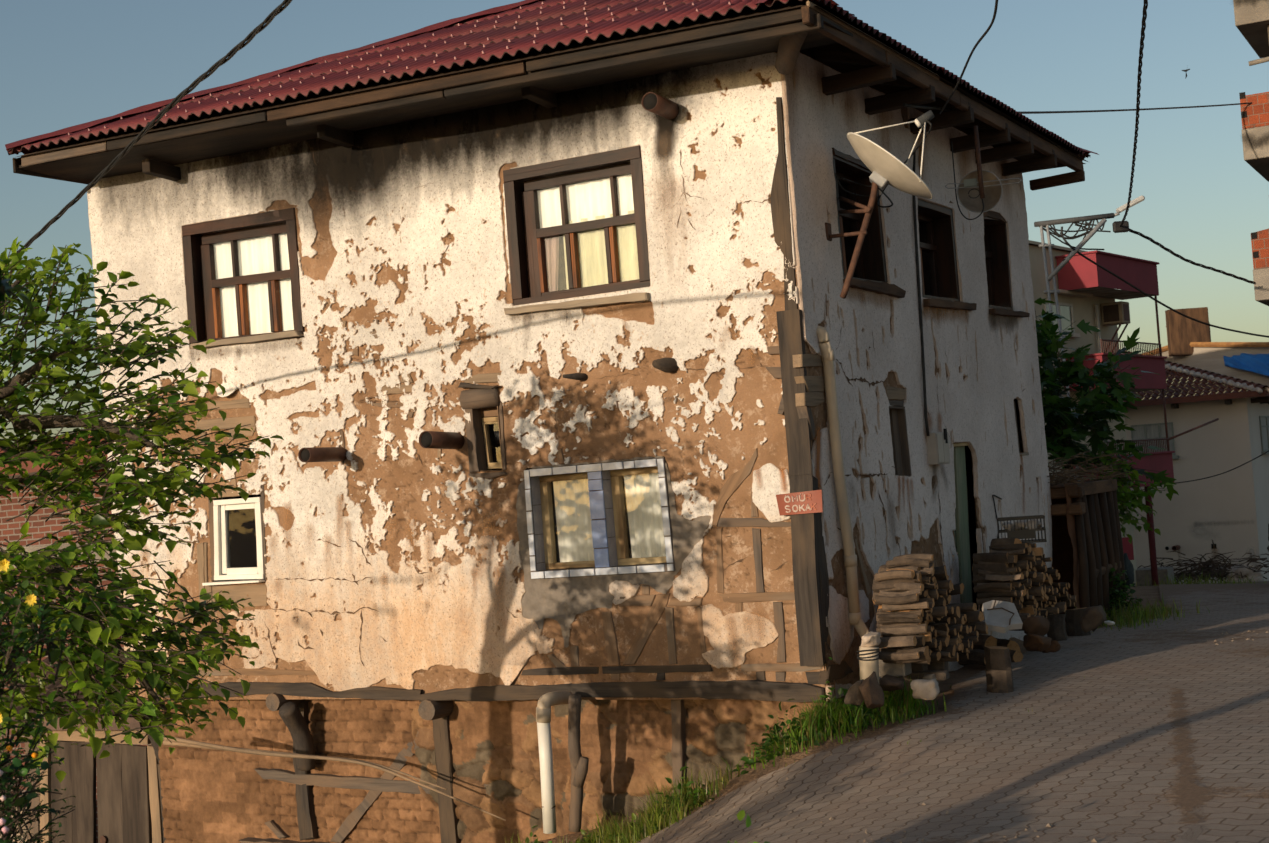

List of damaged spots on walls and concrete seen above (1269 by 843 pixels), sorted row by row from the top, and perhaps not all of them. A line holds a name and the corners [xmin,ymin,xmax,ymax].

peeling [689,139,706,181]
crack [836,327,887,386]
peeling [123,162,875,700]
crack [264,522,387,666]